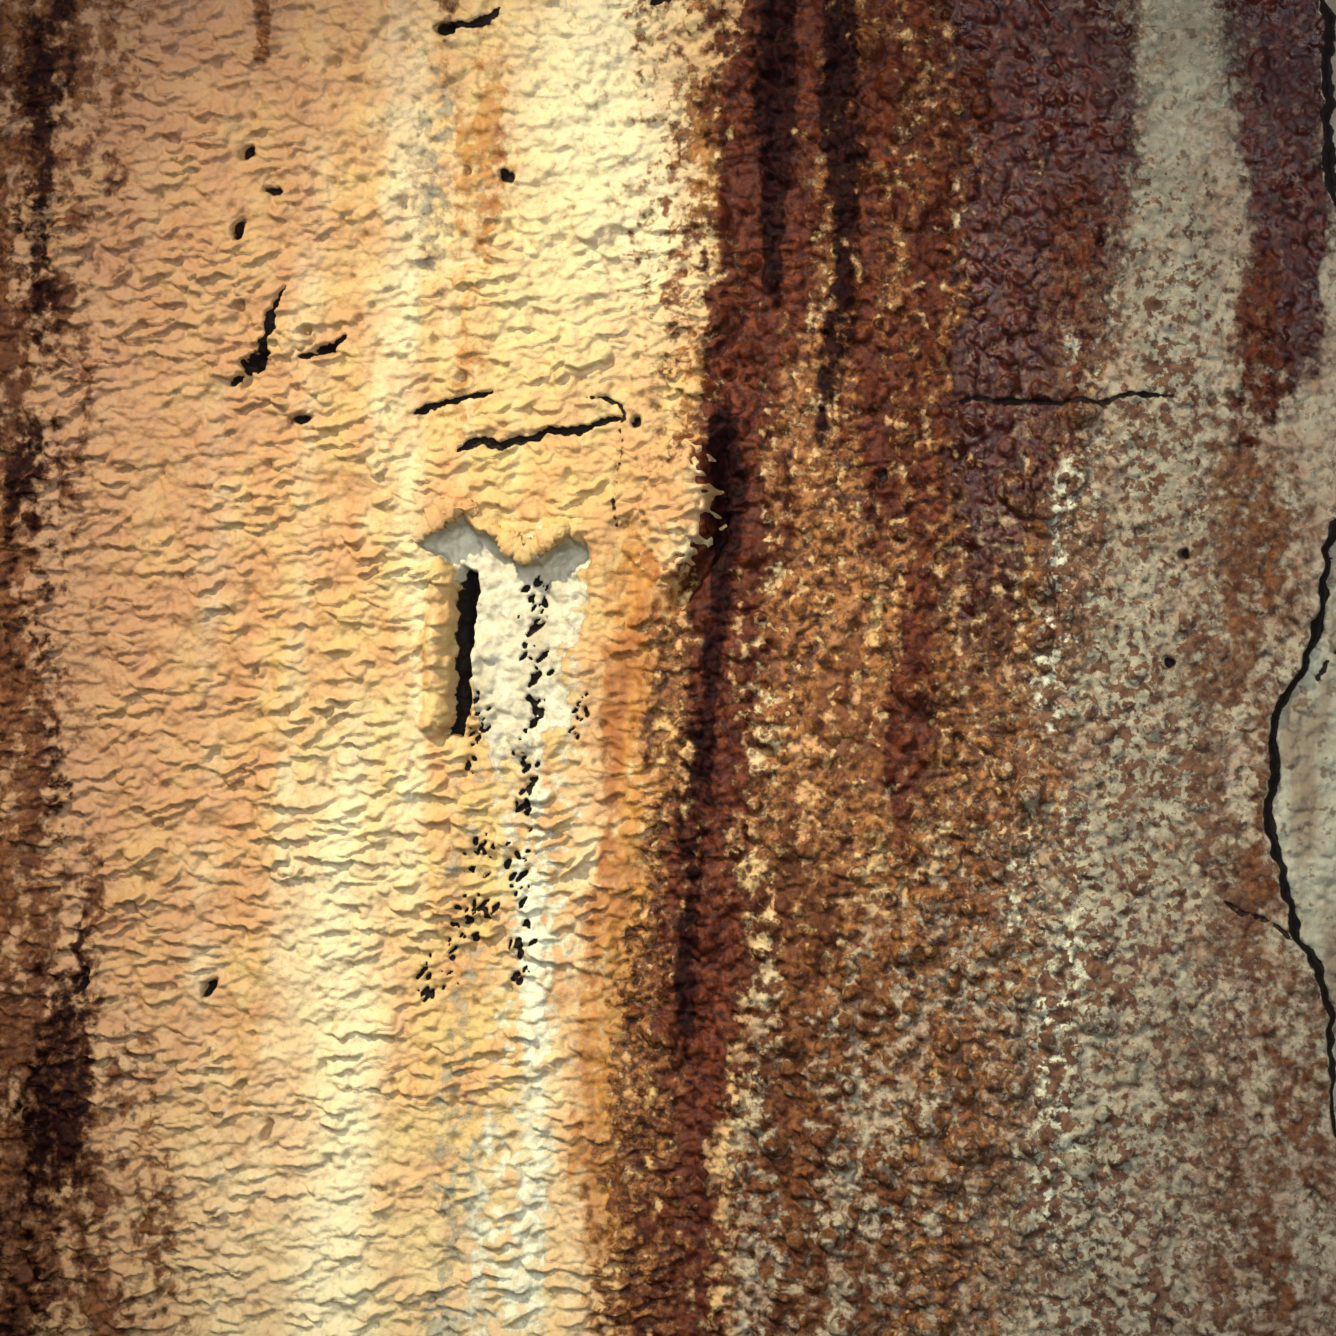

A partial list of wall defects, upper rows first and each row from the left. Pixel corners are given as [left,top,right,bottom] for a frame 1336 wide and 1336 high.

crack [1319,0,1336,206]
crack [231,288,347,386]
crack [457,396,626,527]
crack [951,391,1174,407]
spalling [411,495,591,784]
rust [567,0,1171,1336]
rust [1158,0,1336,1336]
crack [1224,519,1336,1138]